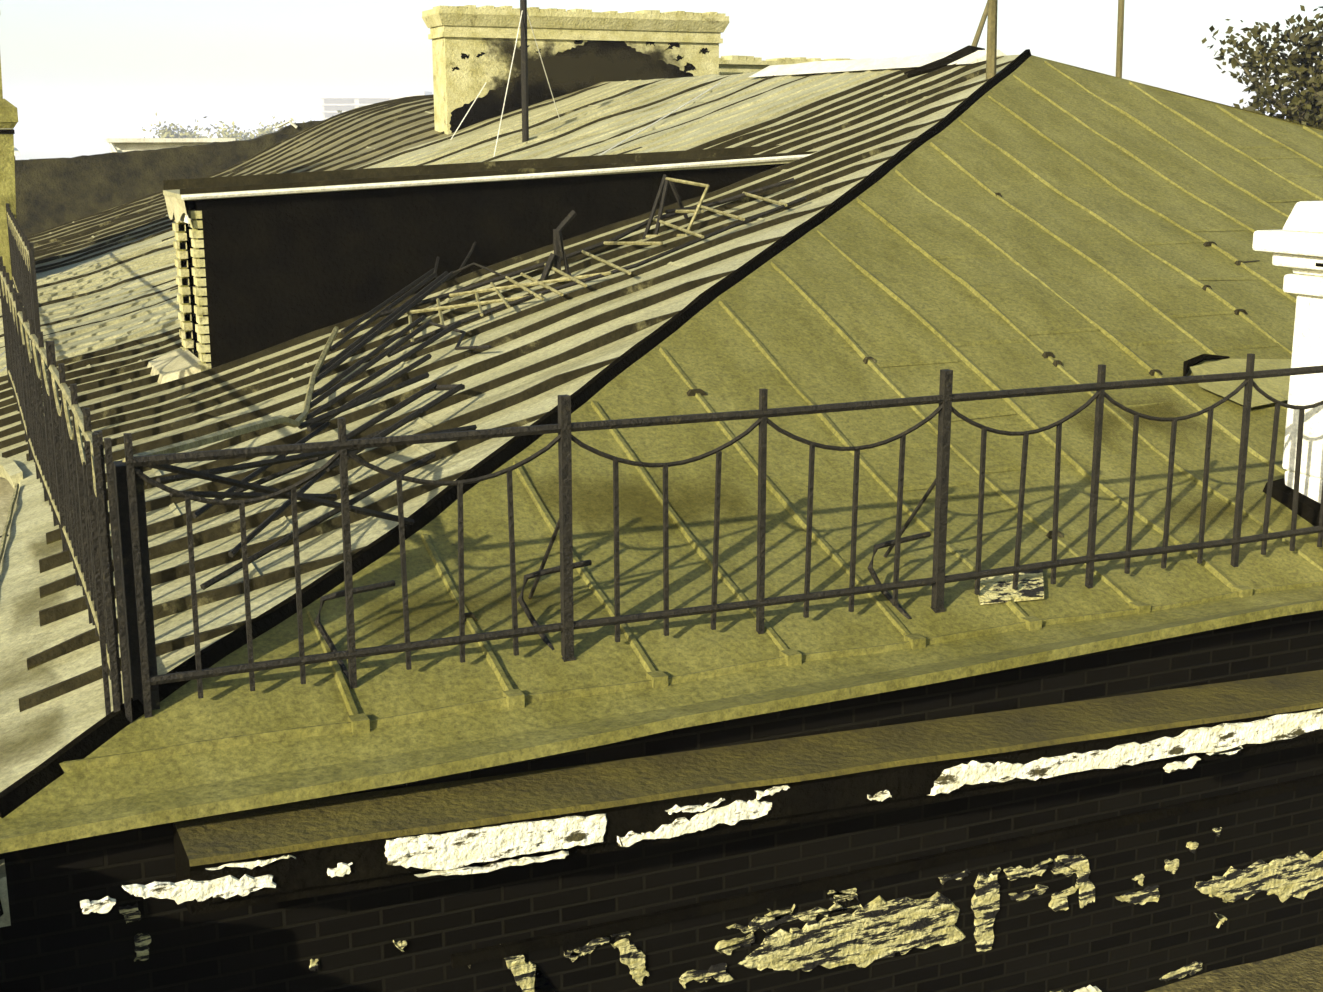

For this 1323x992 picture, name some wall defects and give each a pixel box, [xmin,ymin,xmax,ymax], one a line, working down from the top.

peeling [930,709,1323,796]
peeling [867,790,892,801]
peeling [80,855,296,962]
peeling [327,862,353,877]
peeling [385,785,790,877]
peeling [679,854,1095,988]
peeling [1116,874,1160,905]
peeling [1164,842,1199,874]
peeling [1195,851,1323,928]
peeling [504,954,555,992]
peeling [564,931,649,986]
peeling [1159,961,1203,981]